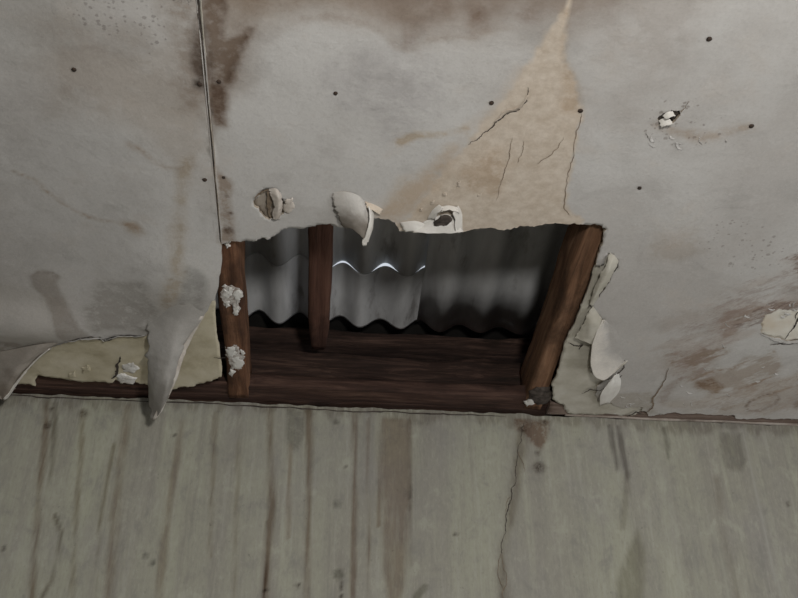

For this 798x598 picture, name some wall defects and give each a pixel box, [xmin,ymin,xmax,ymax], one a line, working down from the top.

damp [0,0,563,340]
peeling [332,191,383,246]
peeling [398,0,590,234]
damp [571,0,764,161]
peeling [0,300,226,420]
peeling [551,253,644,417]
damp [611,204,798,419]
peeling [760,309,798,345]
crack [497,424,525,597]